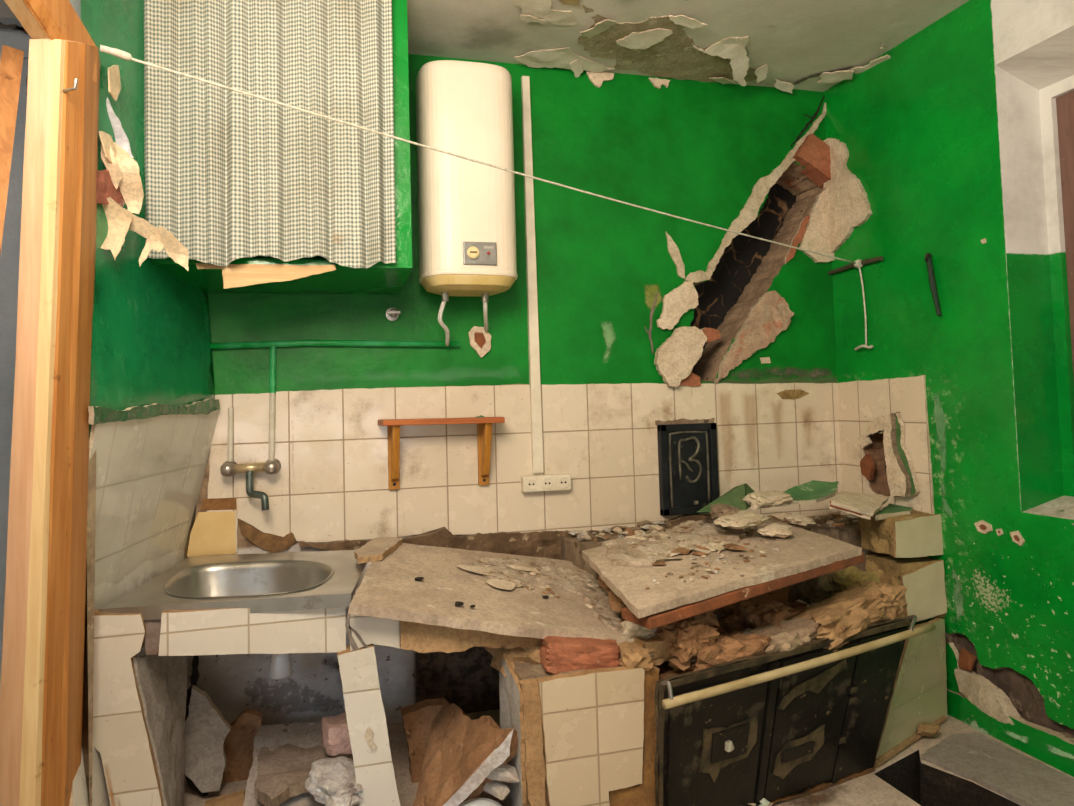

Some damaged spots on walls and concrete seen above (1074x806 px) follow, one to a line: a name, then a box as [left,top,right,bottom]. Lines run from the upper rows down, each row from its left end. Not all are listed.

crack [0,22,29,95]
peeling [512,0,891,93]
peeling [96,65,189,271]
flaking render [654,102,872,387]
flaking render [468,326,492,358]
flaking render [858,412,920,497]
flaking render [974,520,1025,546]
peeling [952,568,1013,619]
flaking render [945,632,1074,759]